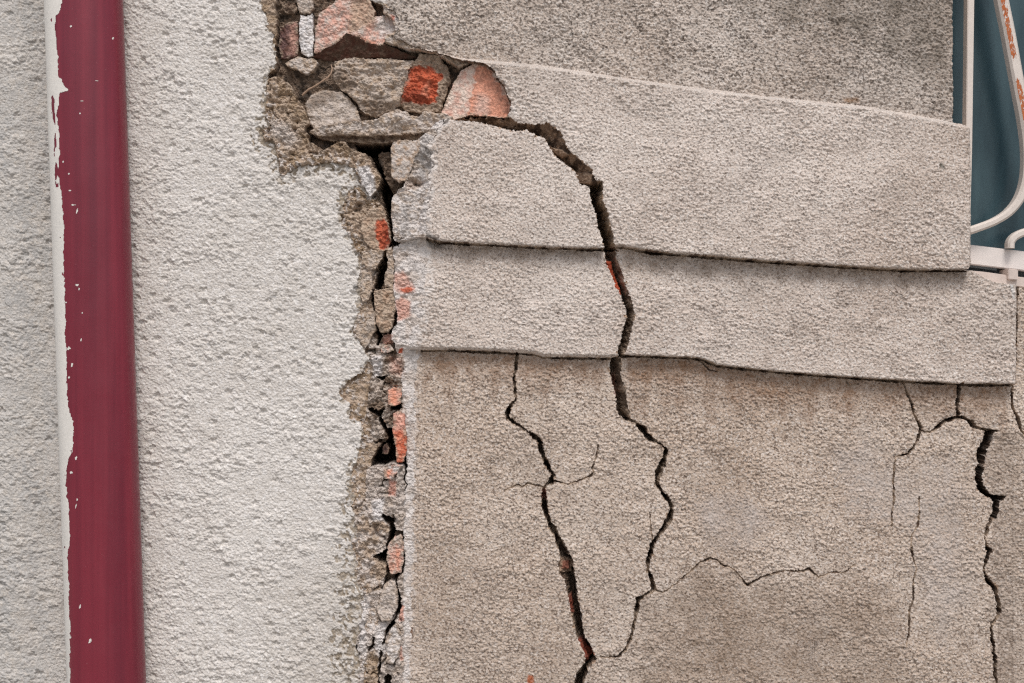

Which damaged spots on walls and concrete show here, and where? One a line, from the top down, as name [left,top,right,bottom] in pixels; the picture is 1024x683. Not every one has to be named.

spalling [261,0,511,683]
crack [354,115,1024,683]